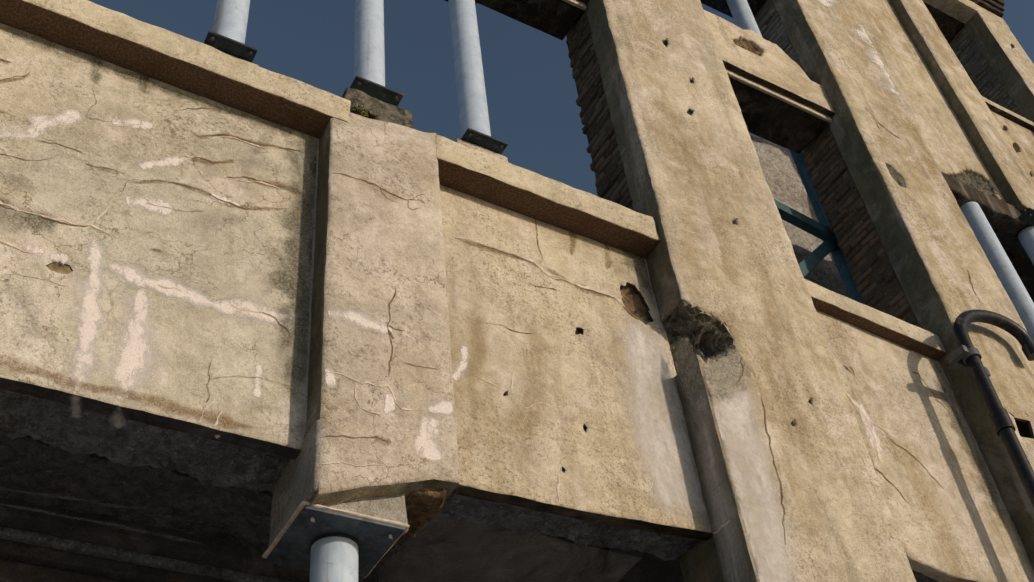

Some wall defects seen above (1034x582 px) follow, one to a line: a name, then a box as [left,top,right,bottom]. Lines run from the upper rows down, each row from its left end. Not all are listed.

efflorescence [0,110,82,141]
crack [85,91,153,129]
crack [0,107,431,286]
spalling [942,171,993,196]
spalling [47,253,72,274]
damp [72,143,392,418]
crack [323,290,440,466]
crack [451,219,625,307]
spalling [620,286,650,325]
spalling [663,301,751,412]
crack [761,392,786,545]
crack [844,366,944,505]